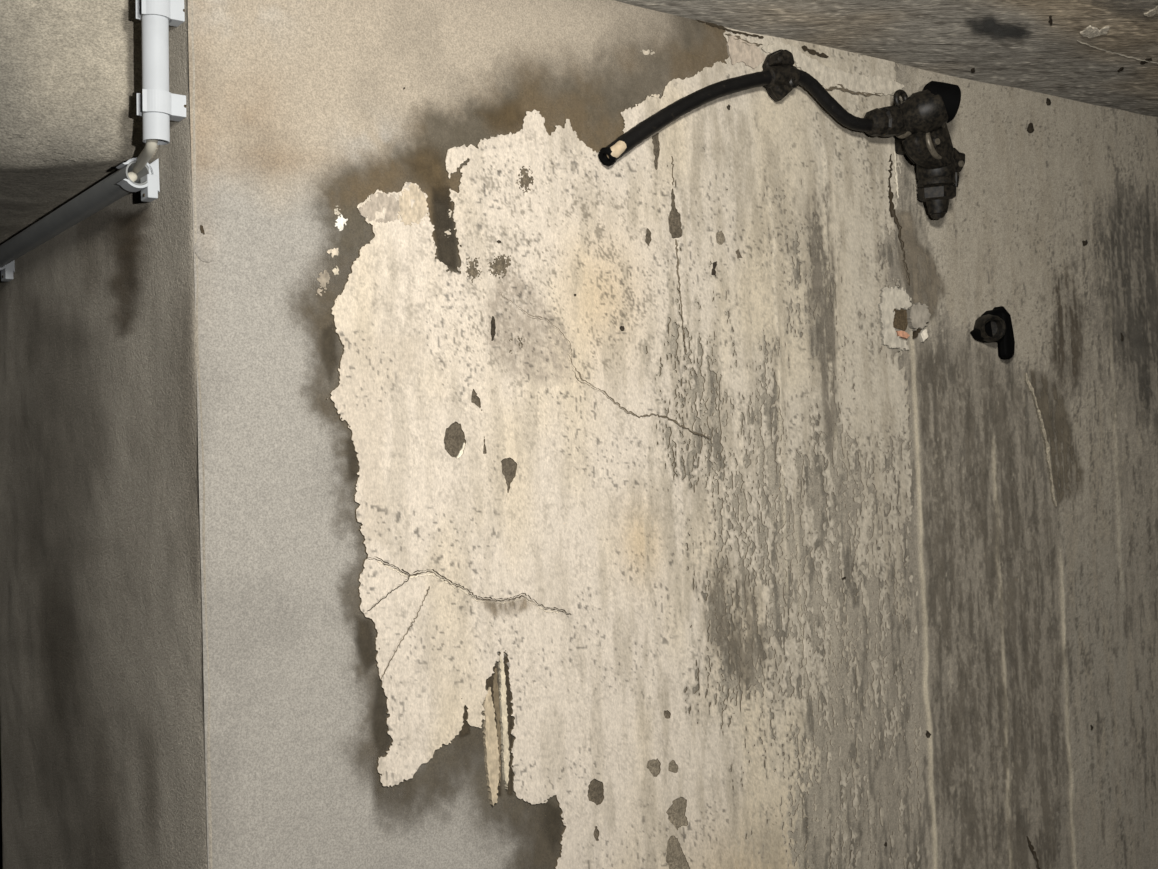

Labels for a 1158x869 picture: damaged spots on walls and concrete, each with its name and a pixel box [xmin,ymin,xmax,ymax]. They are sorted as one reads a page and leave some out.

crack [498,292,712,440]
peeling [316,27,931,869]
damp [1103,207,1158,410]
crack [367,557,570,680]